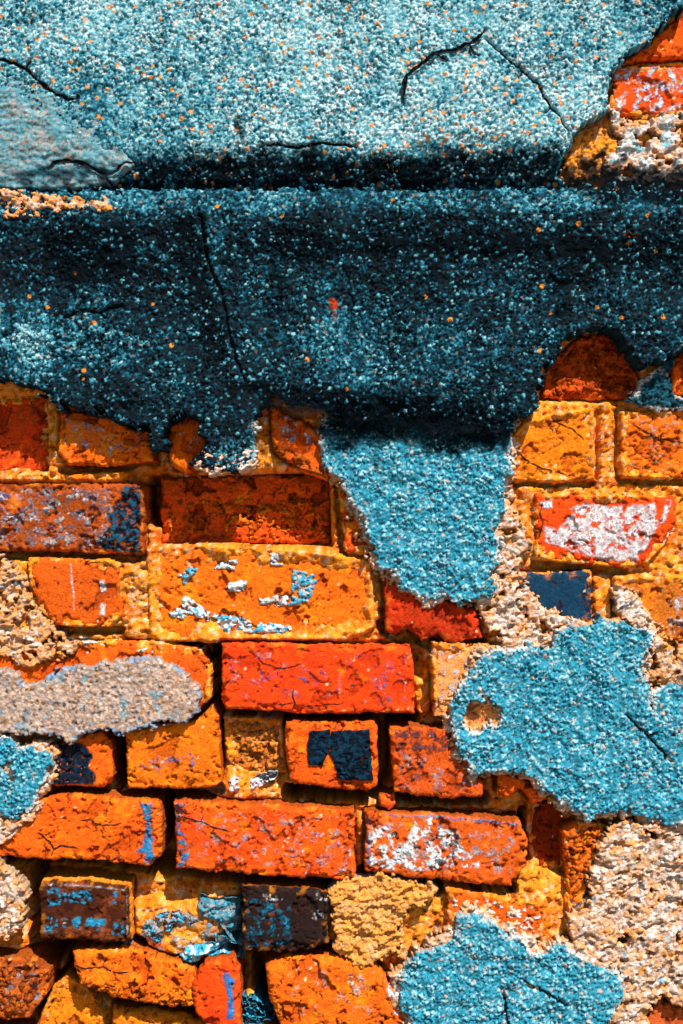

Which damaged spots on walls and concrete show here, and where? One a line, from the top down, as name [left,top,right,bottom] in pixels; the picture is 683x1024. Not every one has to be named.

crack [0,58,78,101]
crack [402,28,569,131]
peeling [633,70,683,111]
crack [200,216,243,376]
peeling [545,500,671,562]
peeling [169,566,292,634]
peeling [259,553,317,606]
peeling [0,486,203,941]
peeling [307,729,373,781]
peeling [367,815,515,871]
peeling [44,884,290,964]
peeling [223,965,275,1024]